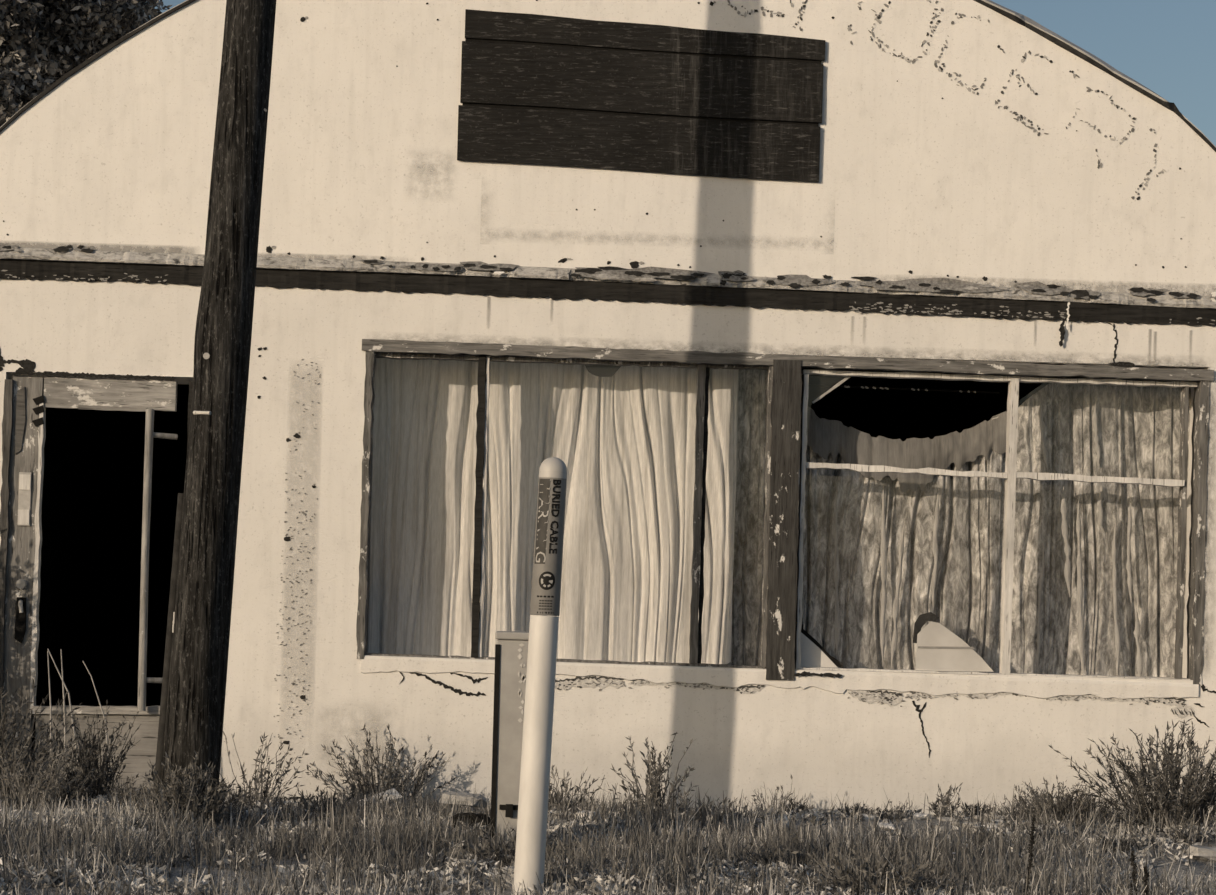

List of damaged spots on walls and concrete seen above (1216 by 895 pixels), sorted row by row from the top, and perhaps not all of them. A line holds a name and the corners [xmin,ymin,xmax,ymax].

spalling [0,243,21,252]
spalling [51,245,95,253]
spalling [360,256,520,275]
peeling [2,270,167,282]
spalling [567,258,1100,319]
spalling [1128,287,1216,302]
crack [0,349,176,381]
crack [794,670,842,678]
crack [912,701,931,757]